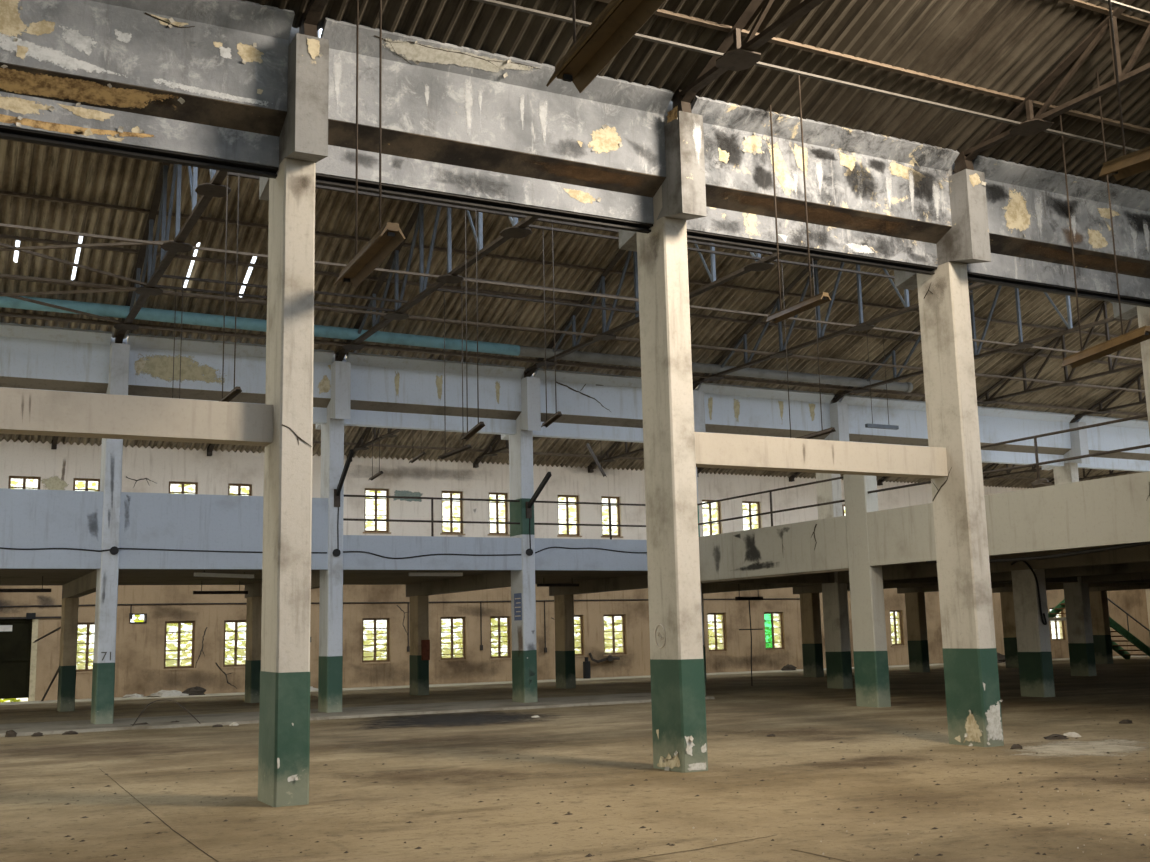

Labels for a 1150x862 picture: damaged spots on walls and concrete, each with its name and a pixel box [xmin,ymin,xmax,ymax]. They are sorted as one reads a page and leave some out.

spalling [0,0,189,142]
peeling [578,124,623,154]
leakage [716,133,741,166]
peeling [718,132,808,193]
leakage [754,167,774,189]
leakage [812,149,835,189]
leakage [846,160,891,202]
leakage [909,170,939,210]
peeling [1002,188,1031,237]
leakage [846,243,888,254]
peeling [955,699,1003,746]
peeling [657,736,707,771]